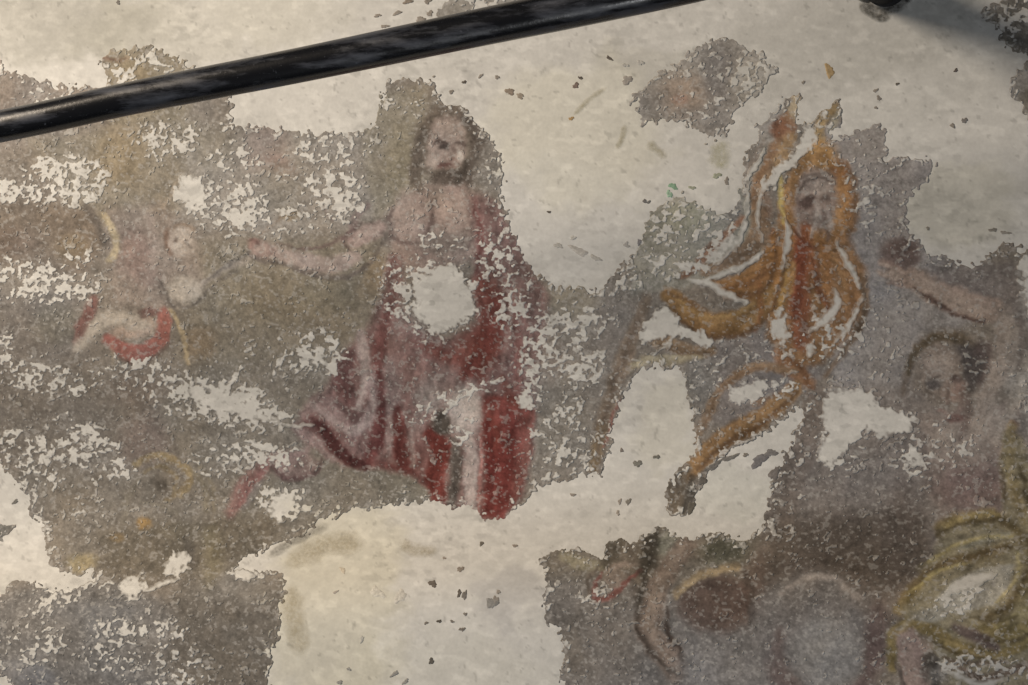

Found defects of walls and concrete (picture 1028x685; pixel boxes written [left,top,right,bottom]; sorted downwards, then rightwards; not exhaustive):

peeling [0,44,196,110]
peeling [0,74,619,685]
peeling [607,37,779,145]
peeling [538,93,1028,685]